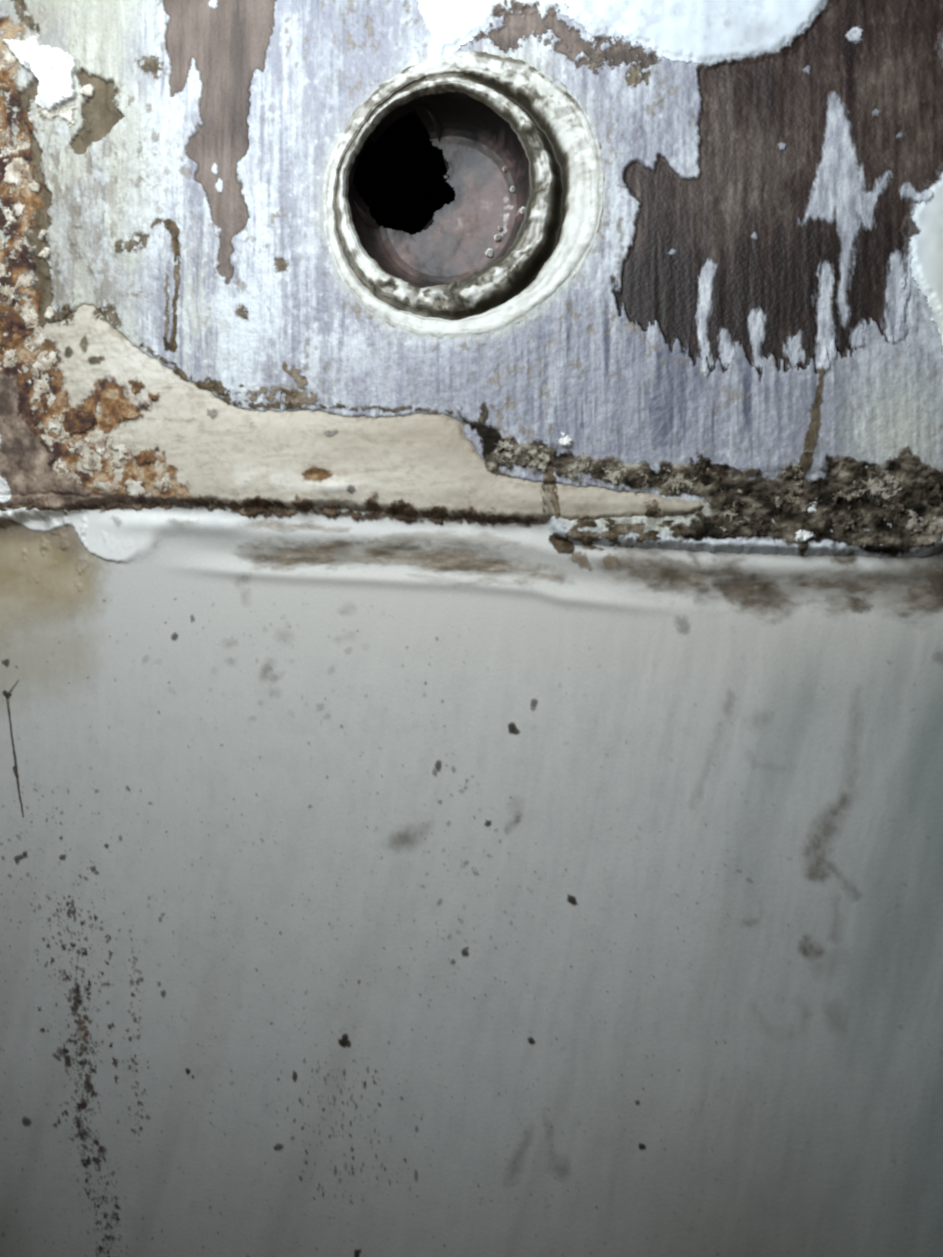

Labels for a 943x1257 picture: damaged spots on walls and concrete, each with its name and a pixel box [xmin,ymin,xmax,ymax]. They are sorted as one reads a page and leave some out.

peeling [70,68,124,155]
peeling [137,0,276,284]
peeling [612,0,943,381]
corrosion [0,17,543,526]
peeling [274,257,288,272]
peeling [235,305,248,319]
spalling [65,336,104,364]
spalling [302,468,332,481]
leakage [250,541,562,580]
leakage [571,551,788,609]
leakage [796,555,943,611]
corrosion [43,930,112,1185]